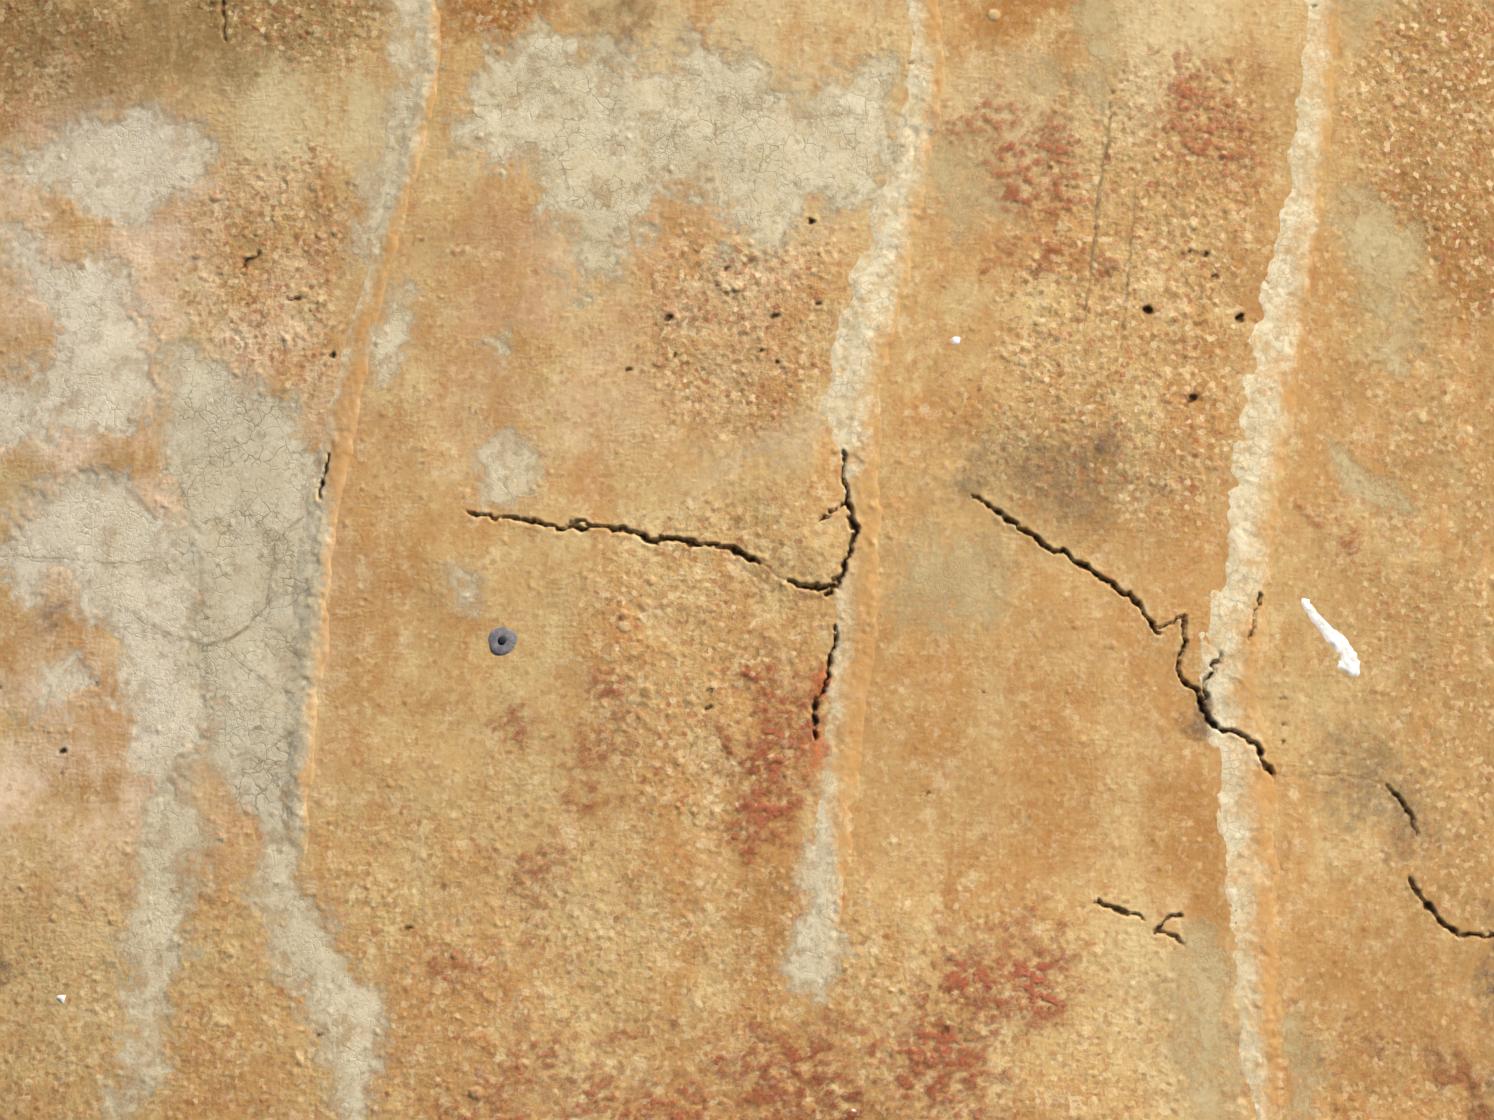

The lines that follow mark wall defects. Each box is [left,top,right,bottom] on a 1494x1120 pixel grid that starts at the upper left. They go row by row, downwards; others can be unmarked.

crack [473,515,755,562]
crack [794,454,859,596]
crack [812,636,836,740]
crack [978,499,1272,775]
crack [1094,901,1180,943]
crack [1408,879,1494,938]